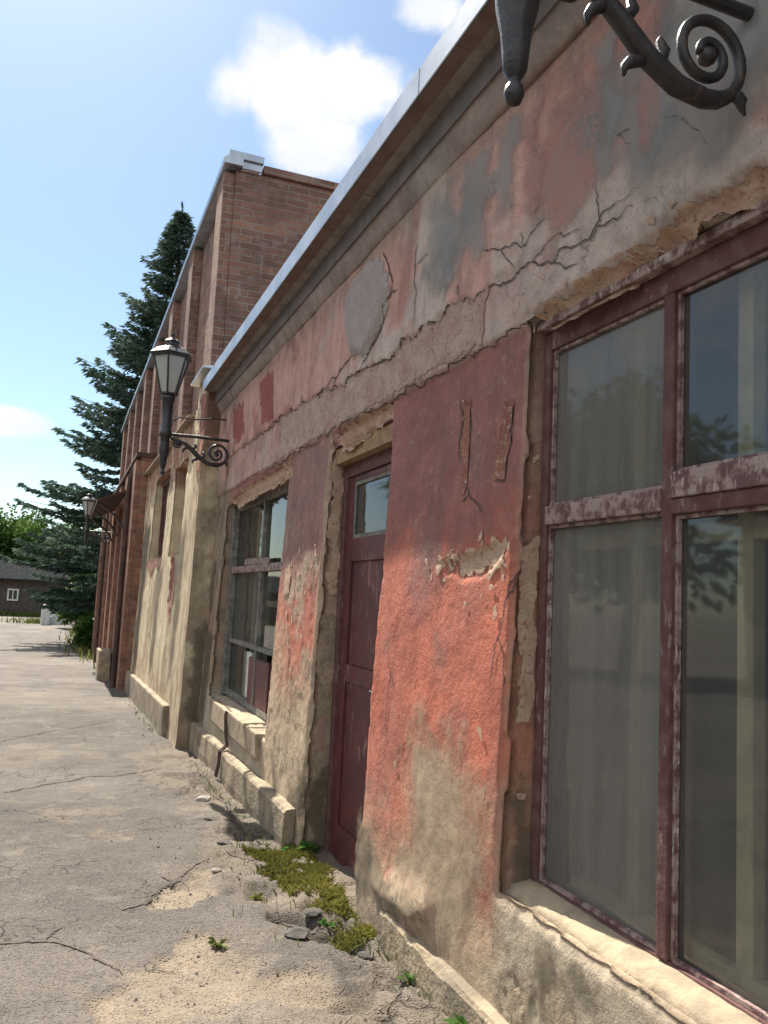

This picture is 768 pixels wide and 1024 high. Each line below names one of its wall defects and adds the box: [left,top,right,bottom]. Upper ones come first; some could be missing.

peeling [233,402,244,443]
crack [228,184,638,492]
crack [462,479,482,513]
peeling [280,544,336,803]
peeling [425,530,540,723]
water stain [355,819,389,891]